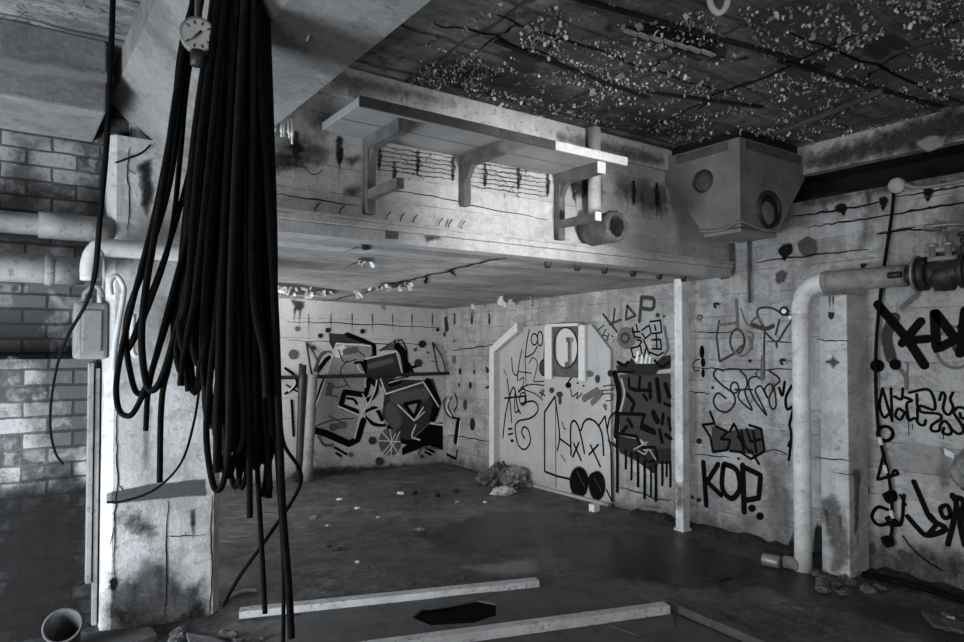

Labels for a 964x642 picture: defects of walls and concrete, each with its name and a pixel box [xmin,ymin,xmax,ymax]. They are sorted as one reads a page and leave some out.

spalling [410,0,964,149]
crack [433,15,964,133]
crack [127,148,136,229]
crack [164,499,213,617]